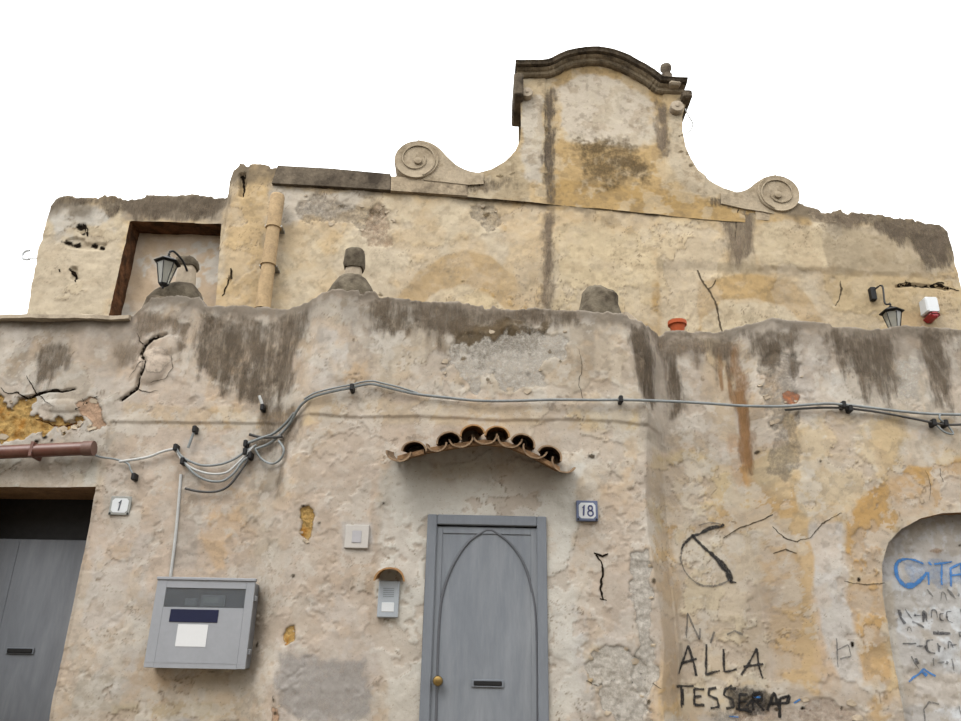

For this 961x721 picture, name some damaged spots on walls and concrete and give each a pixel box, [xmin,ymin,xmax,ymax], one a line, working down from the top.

water stain [577,137,649,190]
water stain [371,89,578,370]
crack [697,270,723,332]
crack [1,378,97,427]
spalling [0,395,107,444]
crack [122,334,168,401]
water stain [136,312,307,452]
water stain [631,326,734,419]
water stain [825,329,950,406]
spalling [299,505,320,544]
crack [594,552,608,601]
peeling [585,549,659,721]